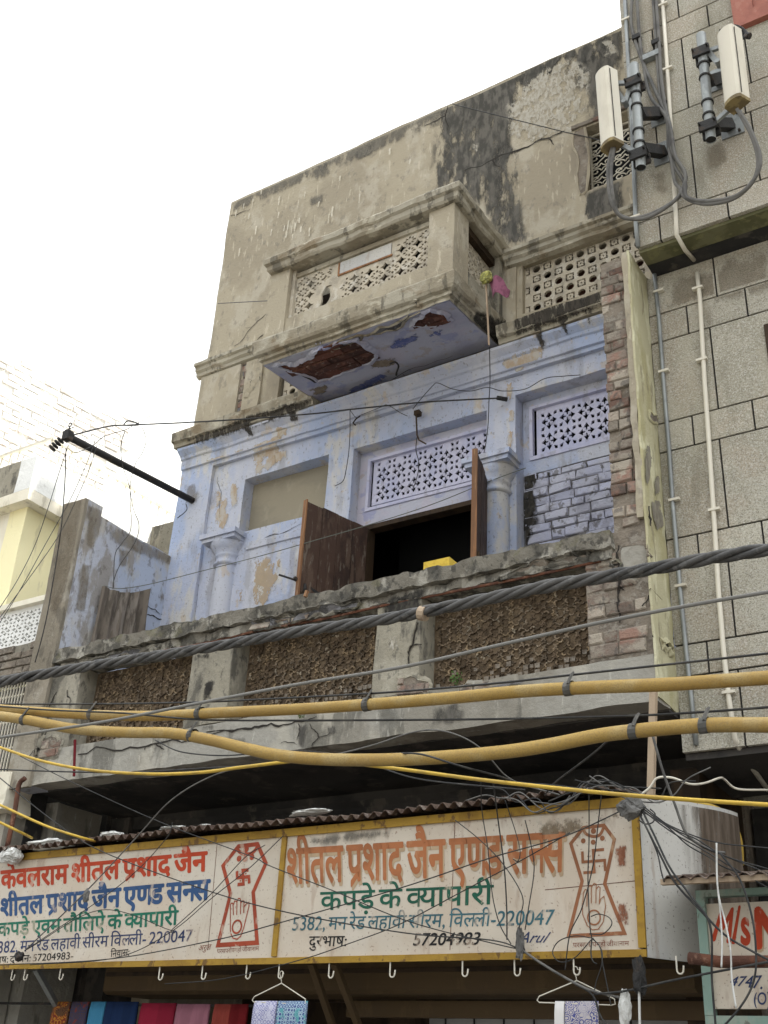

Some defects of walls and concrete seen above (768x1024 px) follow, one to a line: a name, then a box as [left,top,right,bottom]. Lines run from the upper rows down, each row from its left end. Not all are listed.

water stain [234,30,623,243]
crack [466,130,565,170]
spalling [271,299,455,383]
water stain [474,292,602,349]
peeling [237,427,287,473]
peeling [216,484,238,529]
spalling [239,558,361,633]
crack [401,621,422,665]
crack [78,716,330,755]